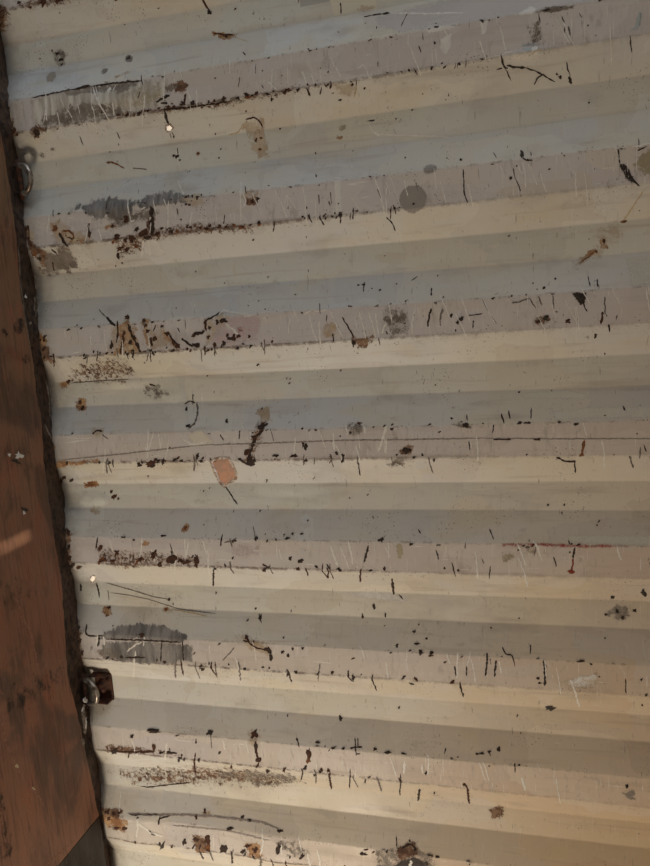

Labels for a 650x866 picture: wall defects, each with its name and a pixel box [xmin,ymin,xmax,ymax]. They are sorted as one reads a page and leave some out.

rust [212,31,248,42]
rust [116,80,300,118]
rust [229,117,269,162]
rust [99,309,261,357]
rust [60,379,128,389]
rust [96,541,201,569]